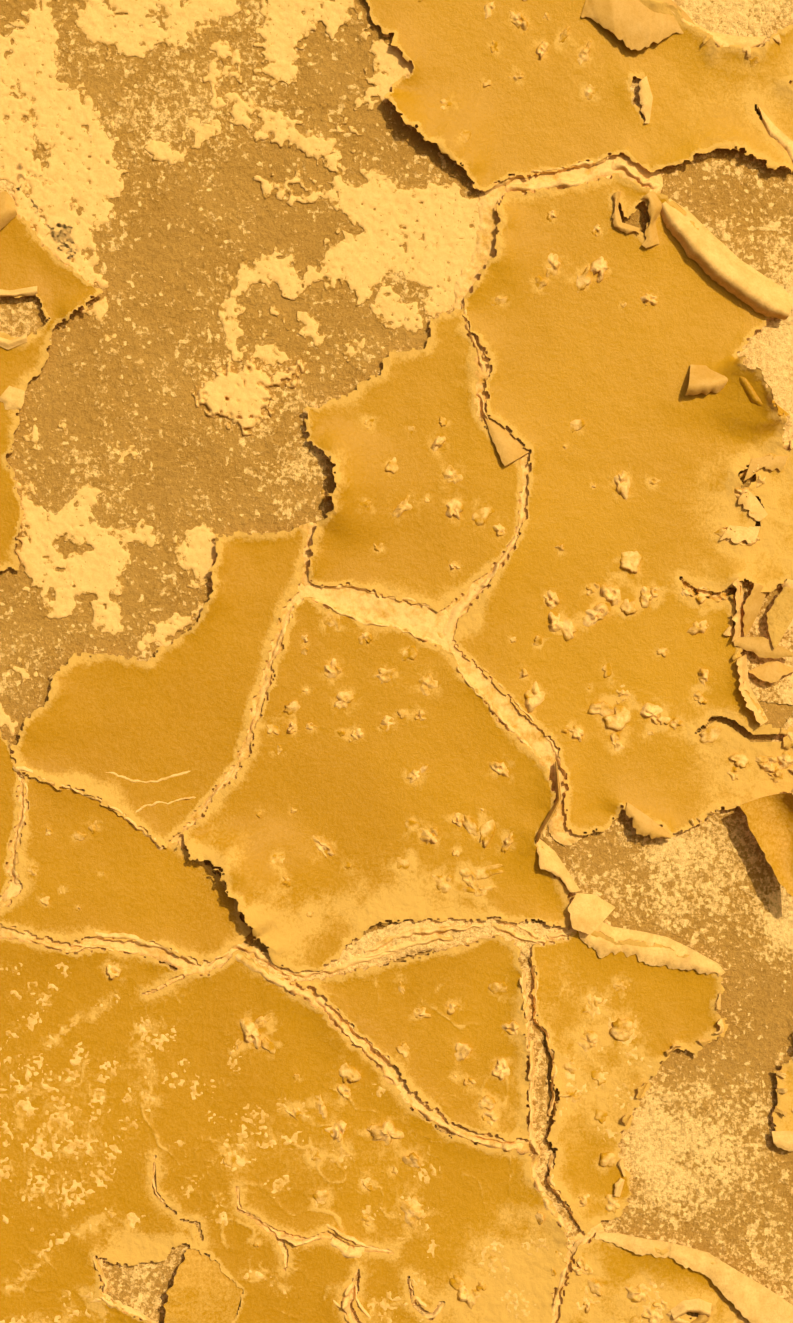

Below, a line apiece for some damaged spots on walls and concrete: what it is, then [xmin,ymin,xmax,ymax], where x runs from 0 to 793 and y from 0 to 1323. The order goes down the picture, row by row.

peeling [536,0,793,67]
peeling [630,76,653,124]
peeling [592,106,793,546]
peeling [0,0,481,755]
peeling [441,465,505,537]
peeling [533,551,660,646]
crack [0,153,663,1323]
peeling [535,578,793,1323]
peeling [162,1058,216,1100]
peeling [337,1063,386,1101]
peeling [208,1094,352,1171]
peeling [391,1152,441,1291]